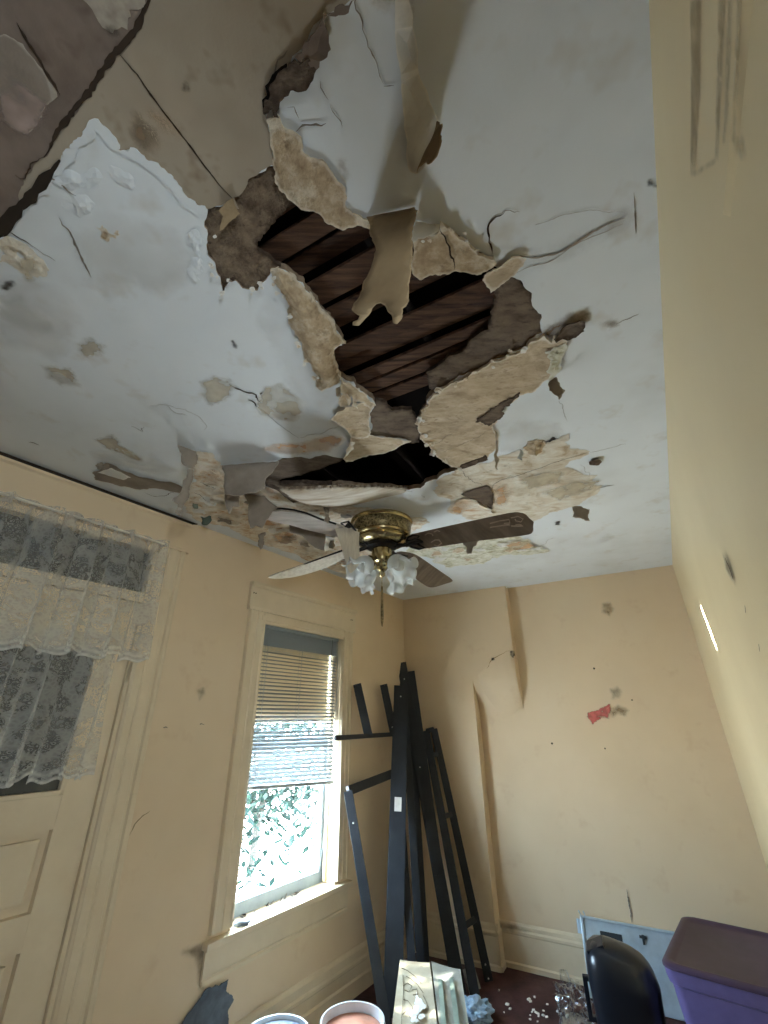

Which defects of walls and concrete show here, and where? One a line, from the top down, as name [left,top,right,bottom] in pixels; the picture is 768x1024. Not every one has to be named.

crack [0,0,232,261]
flaking render [0,0,619,574]
crack [487,210,519,251]